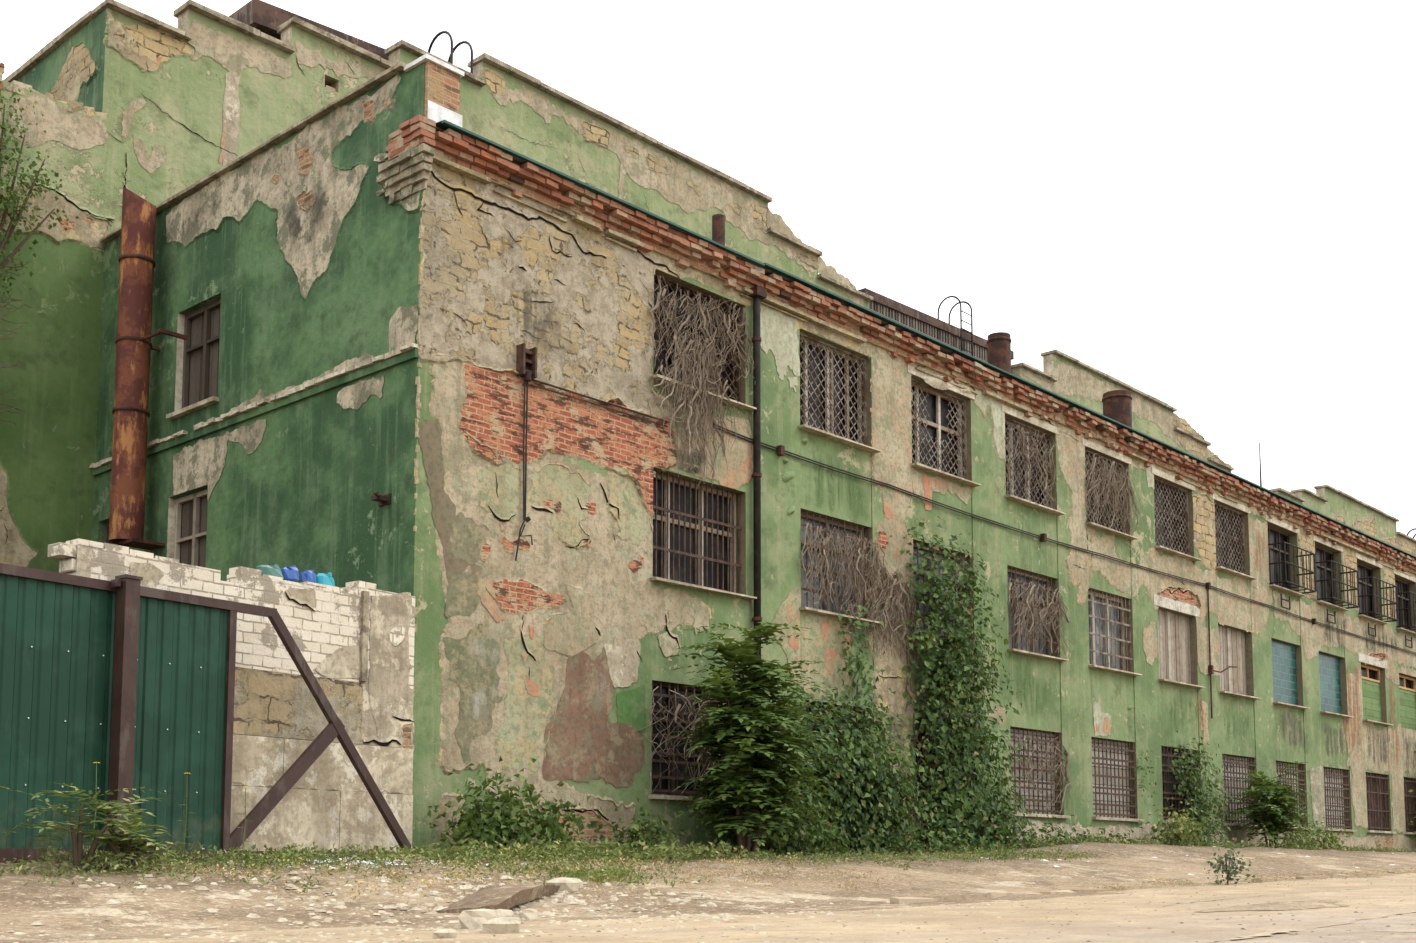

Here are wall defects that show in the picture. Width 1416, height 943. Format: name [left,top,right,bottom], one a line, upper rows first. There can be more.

crack [142,94,238,156]
flaking render [0,18,403,302]
flaking render [482,67,865,307]
flaking render [0,461,39,568]
flaking render [173,419,266,500]
crack [488,472,647,554]
flaking render [228,162,1416,853]